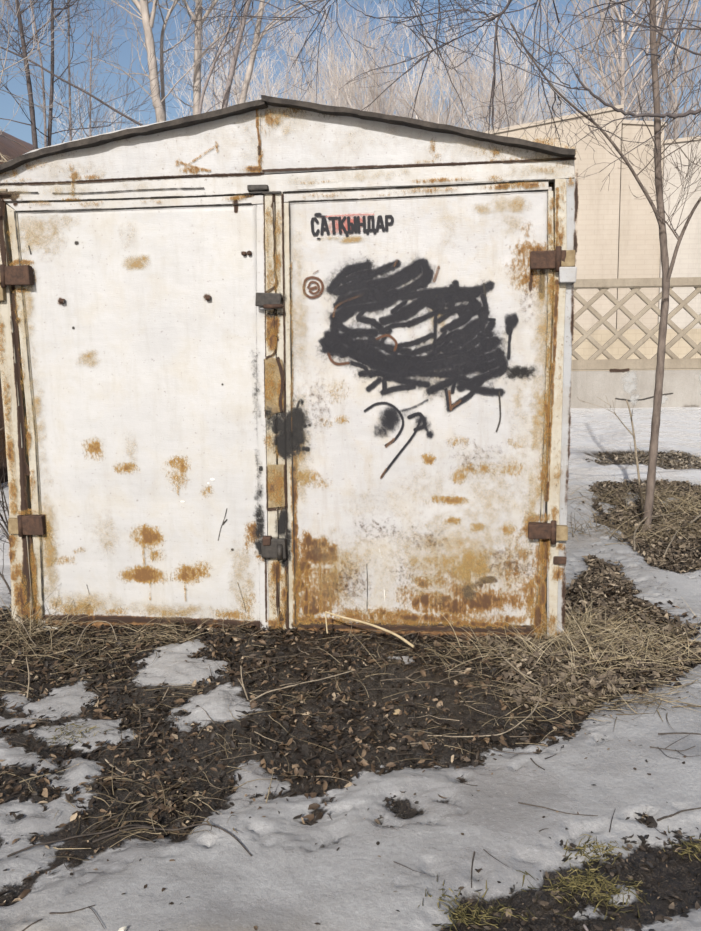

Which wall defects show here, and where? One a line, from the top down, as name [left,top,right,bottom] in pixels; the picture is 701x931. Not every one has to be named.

corrosion [62,166,102,207]
corrosion [175,141,218,173]
corrosion [0,191,36,278]
corrosion [0,283,36,515]
corrosion [8,173,579,642]